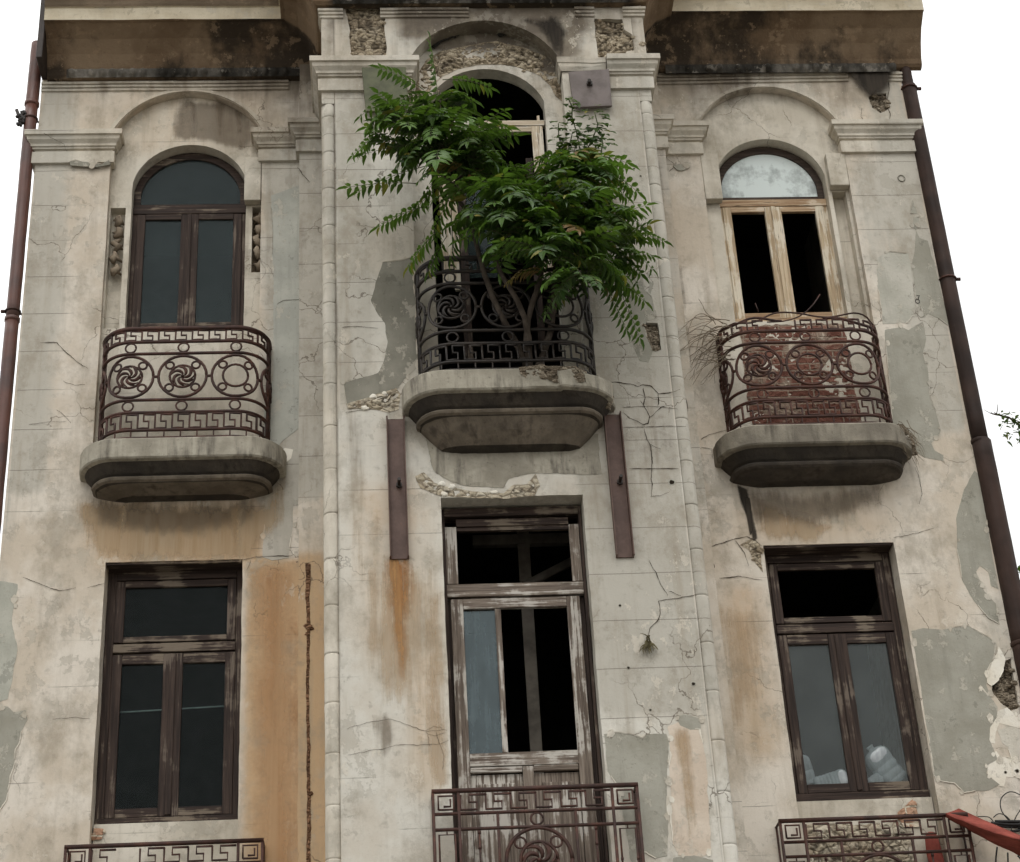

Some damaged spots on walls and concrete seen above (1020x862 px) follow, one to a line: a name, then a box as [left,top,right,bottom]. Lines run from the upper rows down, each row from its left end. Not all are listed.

leakage [849,72,892,94]
peeling [877,200,949,461]
crack [612,382,726,497]
rust [389,559,409,667]
crack [648,561,694,635]
peeling [956,470,1000,624]
peeling [0,581,27,810]
peeling [912,623,1020,795]
peeling [604,714,713,862]